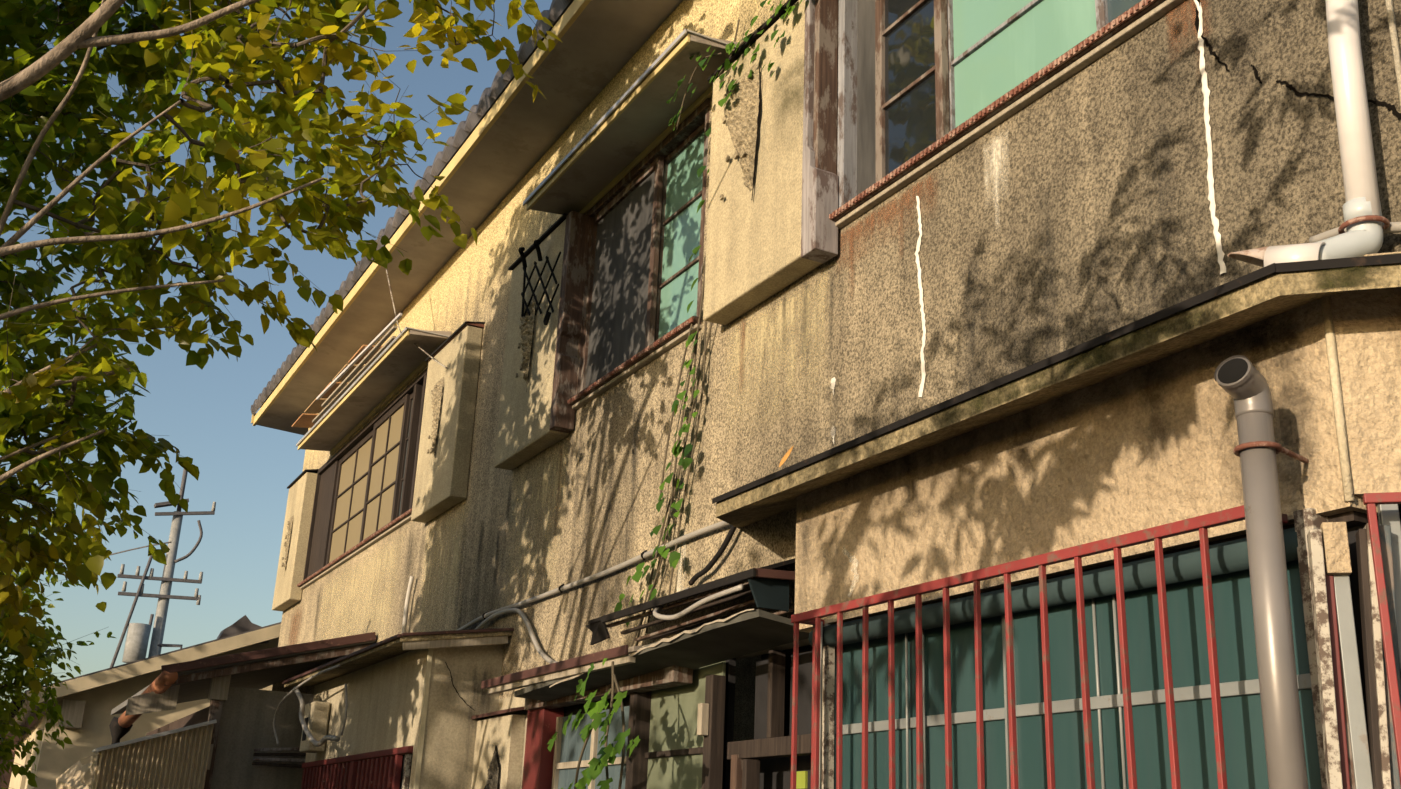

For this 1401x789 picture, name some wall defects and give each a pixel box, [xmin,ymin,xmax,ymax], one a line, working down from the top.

spalling [722,62,763,201]
crack [1194,0,1334,274]
crack [1368,99,1401,120]